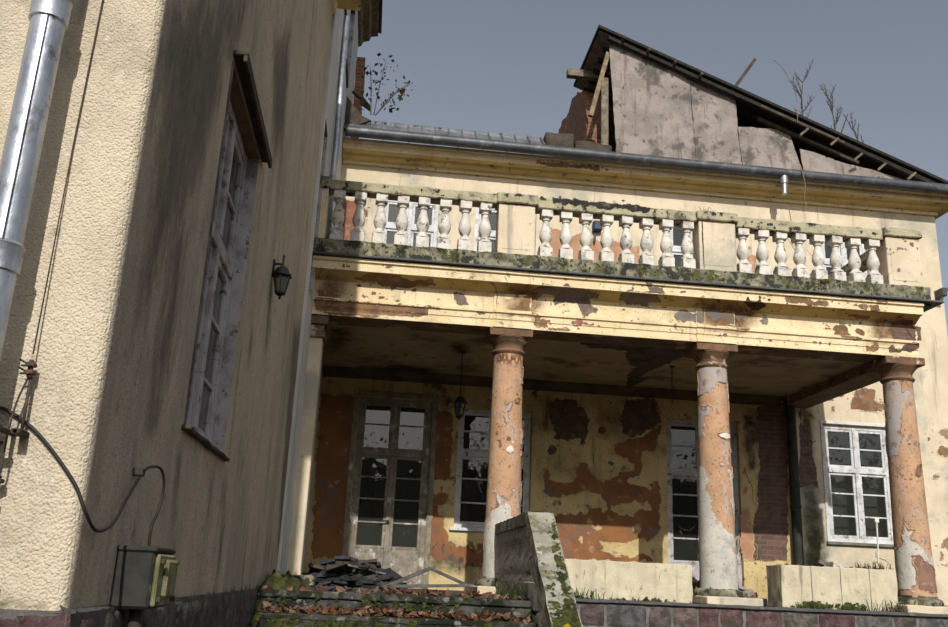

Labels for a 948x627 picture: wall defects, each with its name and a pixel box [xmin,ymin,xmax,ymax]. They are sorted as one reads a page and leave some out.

water stain [274,47,288,143]
water stain [146,11,239,288]
peeling [314,265,441,318]
peeling [517,278,600,331]
peeling [615,281,774,337]
spalling [813,299,922,353]
water stain [278,330,299,545]
peeling [310,388,360,563]
peeling [430,409,513,578]
peeling [543,396,666,562]
peeling [697,361,730,438]
peeling [895,522,948,593]